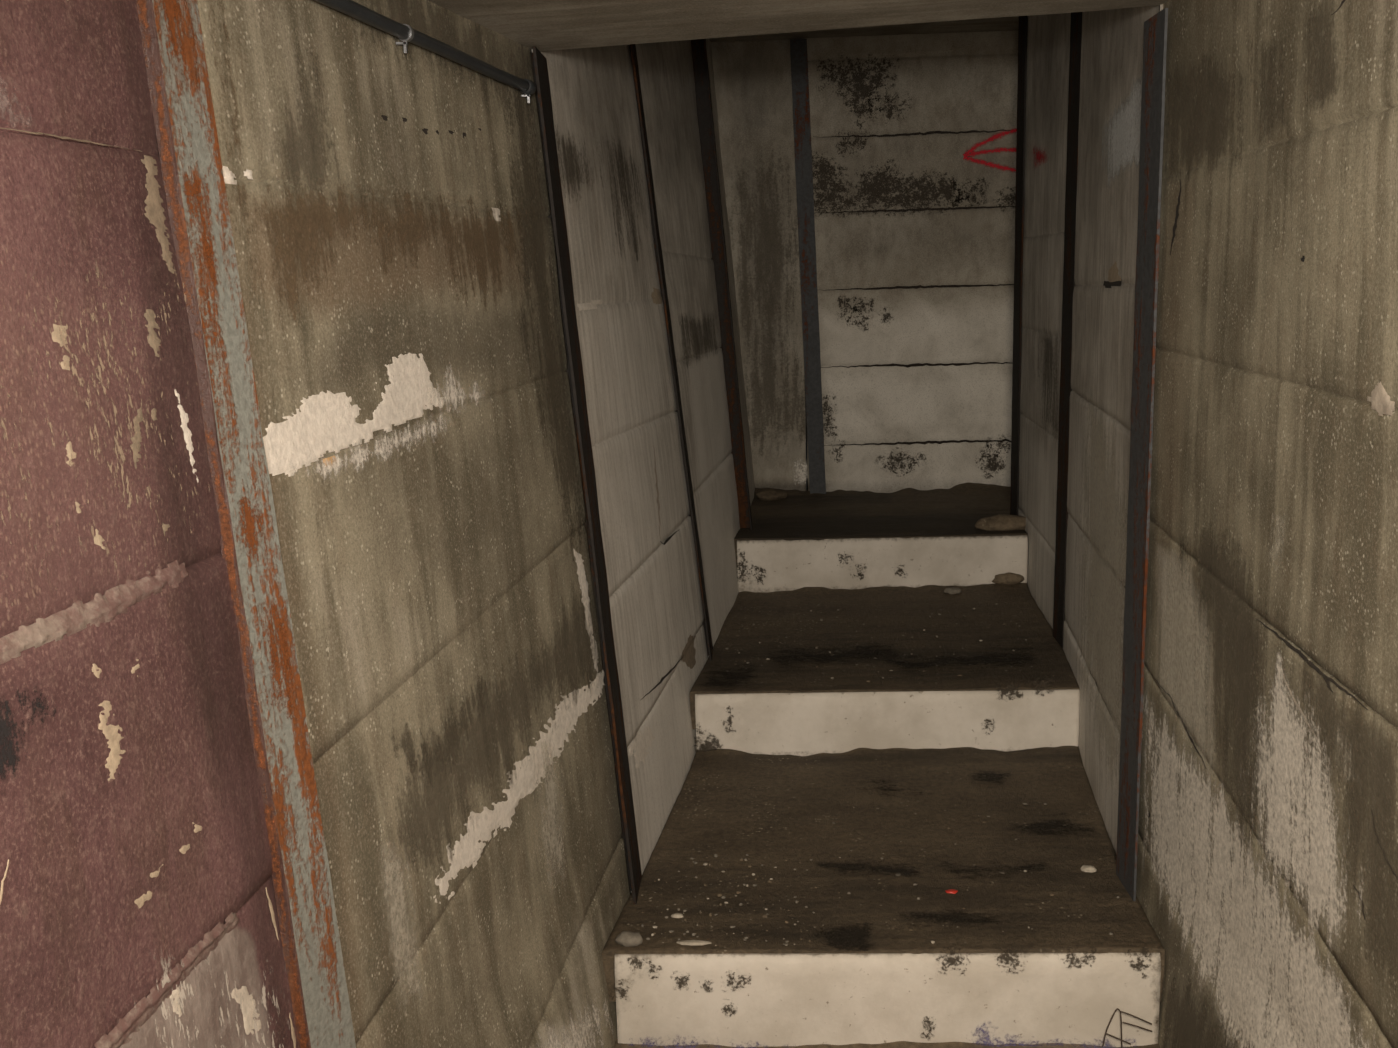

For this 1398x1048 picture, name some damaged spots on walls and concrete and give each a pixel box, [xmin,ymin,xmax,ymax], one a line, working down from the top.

leakage [812,54,1016,218]
flaking render [141,155,176,274]
peeling [51,324,70,370]
peeling [65,441,76,466]
peeling [144,309,161,357]
flaking render [174,390,199,482]
corrosion [138,0,294,769]
leakage [878,447,926,475]
leakage [975,436,1011,478]
leakage [1081,409,1127,767]
leakage [1142,535,1398,1048]
corrosion [264,806,307,1048]